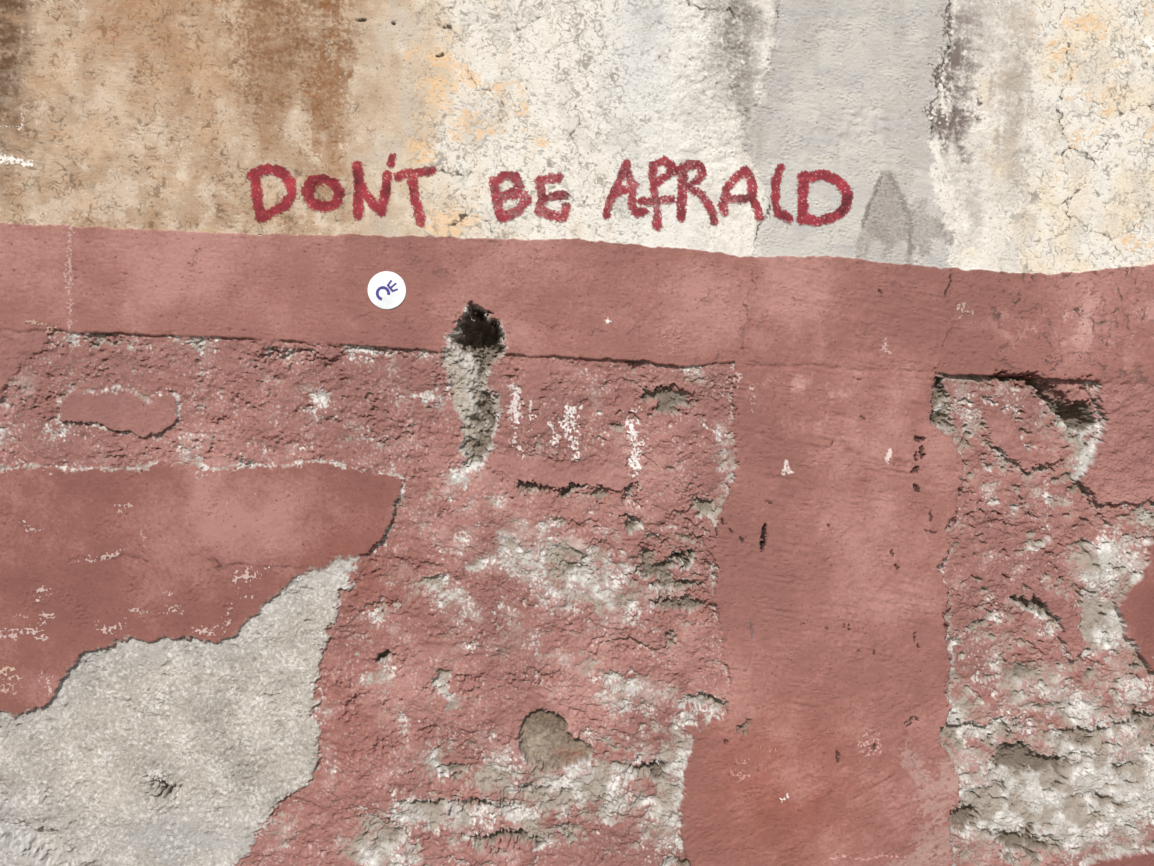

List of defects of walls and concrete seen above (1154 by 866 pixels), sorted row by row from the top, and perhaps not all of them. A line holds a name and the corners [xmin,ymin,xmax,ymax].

damp [595,0,1134,269]
crack [1055,3,1154,252]
spalling [0,312,756,866]
spalling [857,373,1154,866]